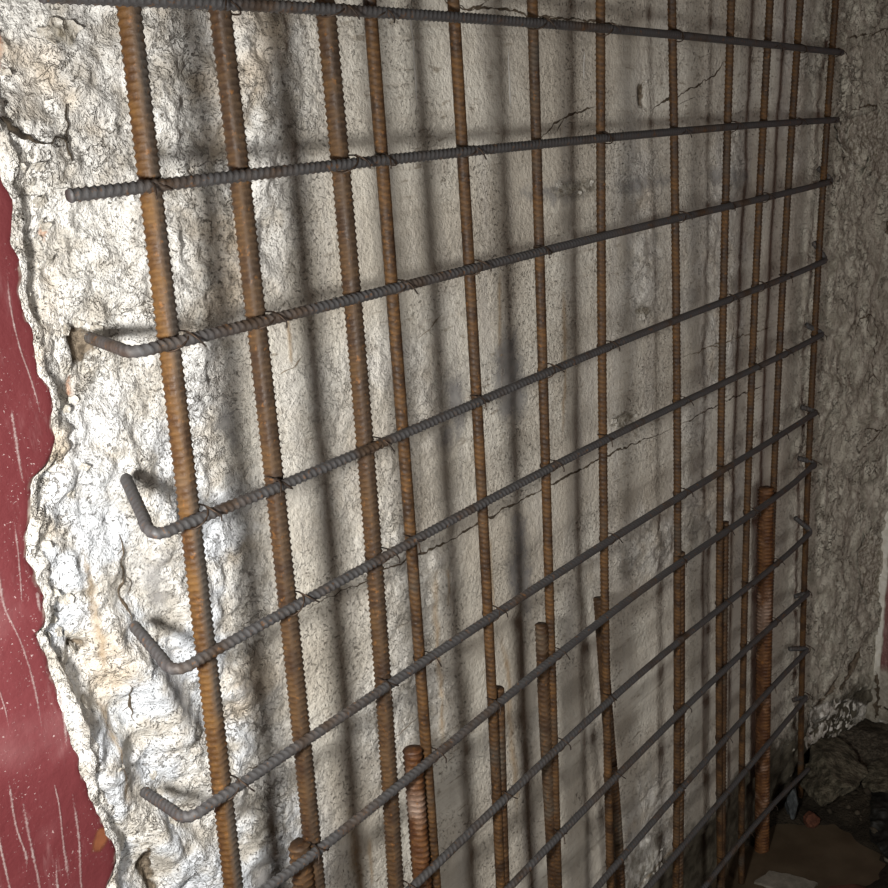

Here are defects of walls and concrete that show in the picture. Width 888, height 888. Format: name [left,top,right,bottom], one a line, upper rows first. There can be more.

spalling [806,0,847,118]
crack [0,104,73,162]
crack [542,107,594,137]
spalling [784,126,797,190]
spalling [779,195,792,276]
spalling [772,359,783,437]
spalling [0,97,136,888]
crack [308,386,761,610]
peeling [857,527,883,604]
spalling [804,680,867,755]
rust [93,828,108,851]
spalling [135,842,157,888]